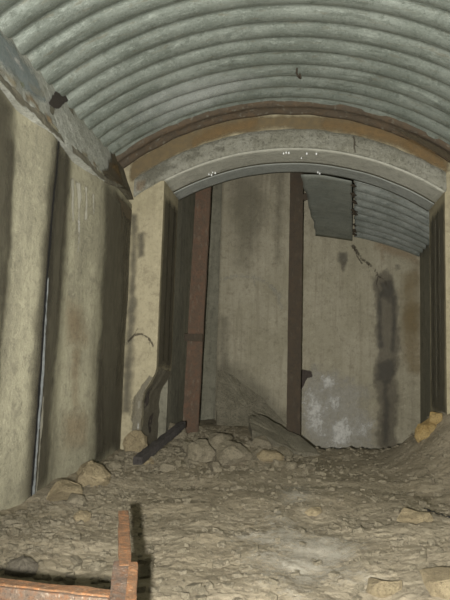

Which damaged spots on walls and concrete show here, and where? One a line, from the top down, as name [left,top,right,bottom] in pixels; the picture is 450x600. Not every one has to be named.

spalling [0,75,74,142]
corrosion [130,116,448,180]
crack [352,245,388,288]
leakage [374,271,399,448]
leakage [303,388,339,436]
leakage [332,418,371,449]